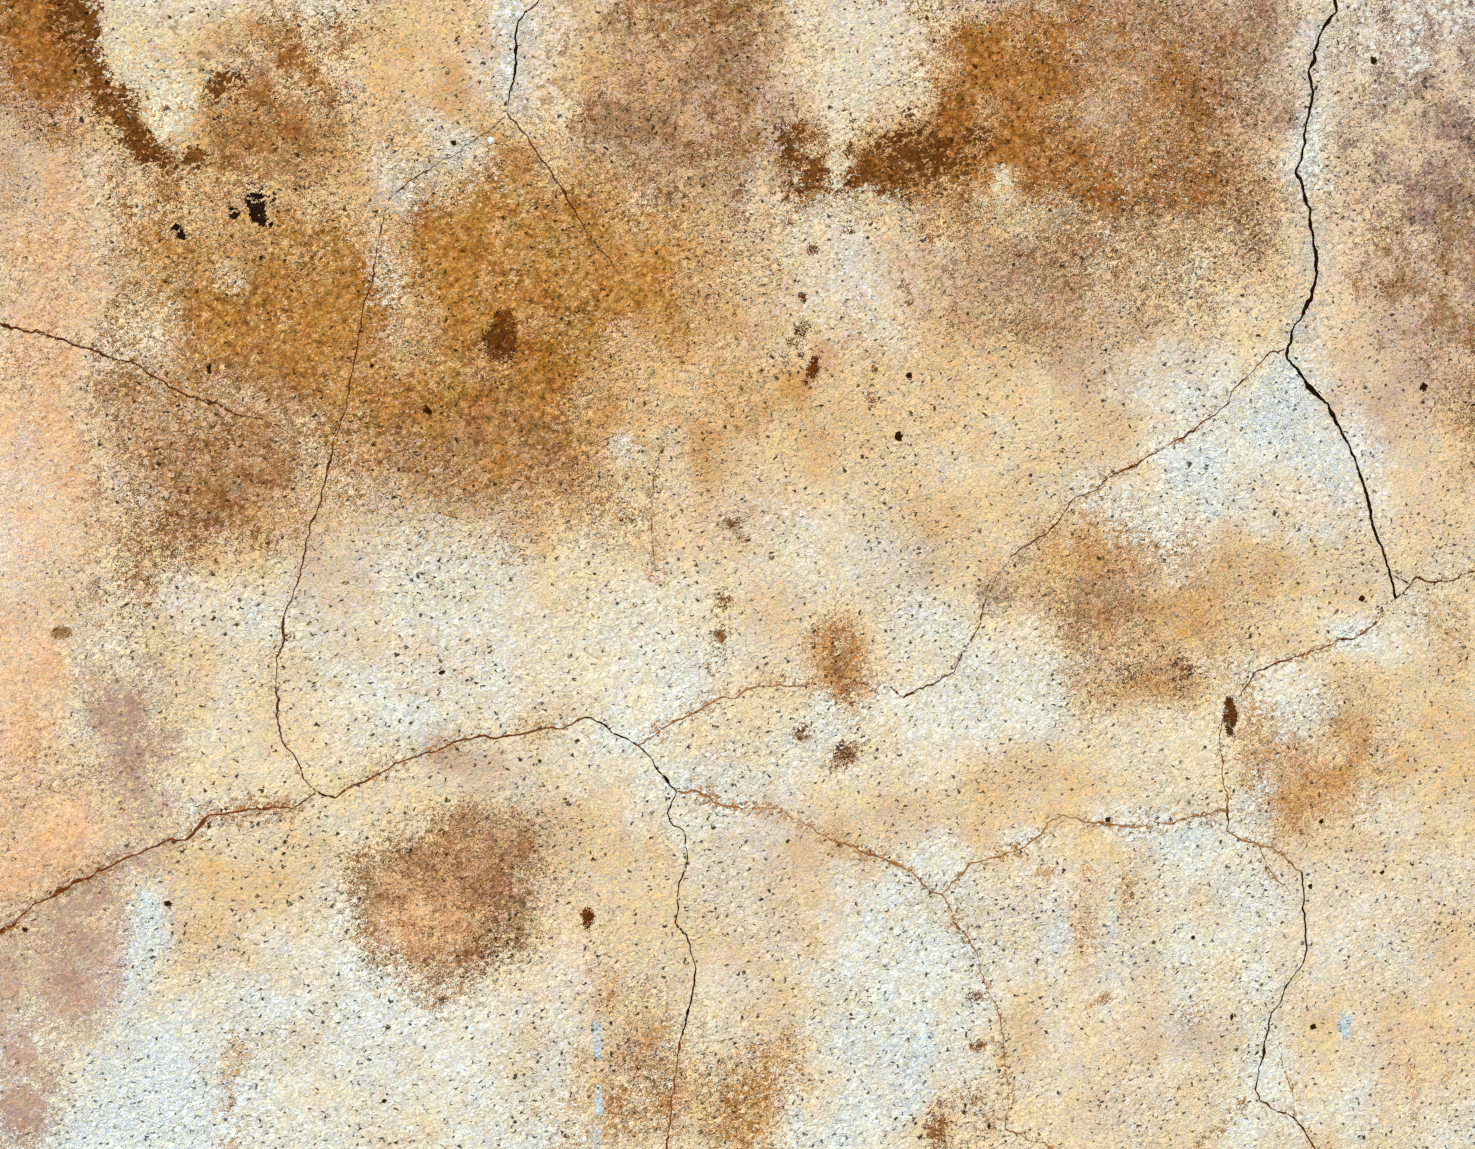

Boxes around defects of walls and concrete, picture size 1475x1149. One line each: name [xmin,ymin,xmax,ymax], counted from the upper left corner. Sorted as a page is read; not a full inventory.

crack [362,112,505,224]
crack [487,0,624,281]
rust [0,0,1338,589]
crack [824,0,1475,698]
crack [0,215,1318,1149]
rust [786,597,887,778]